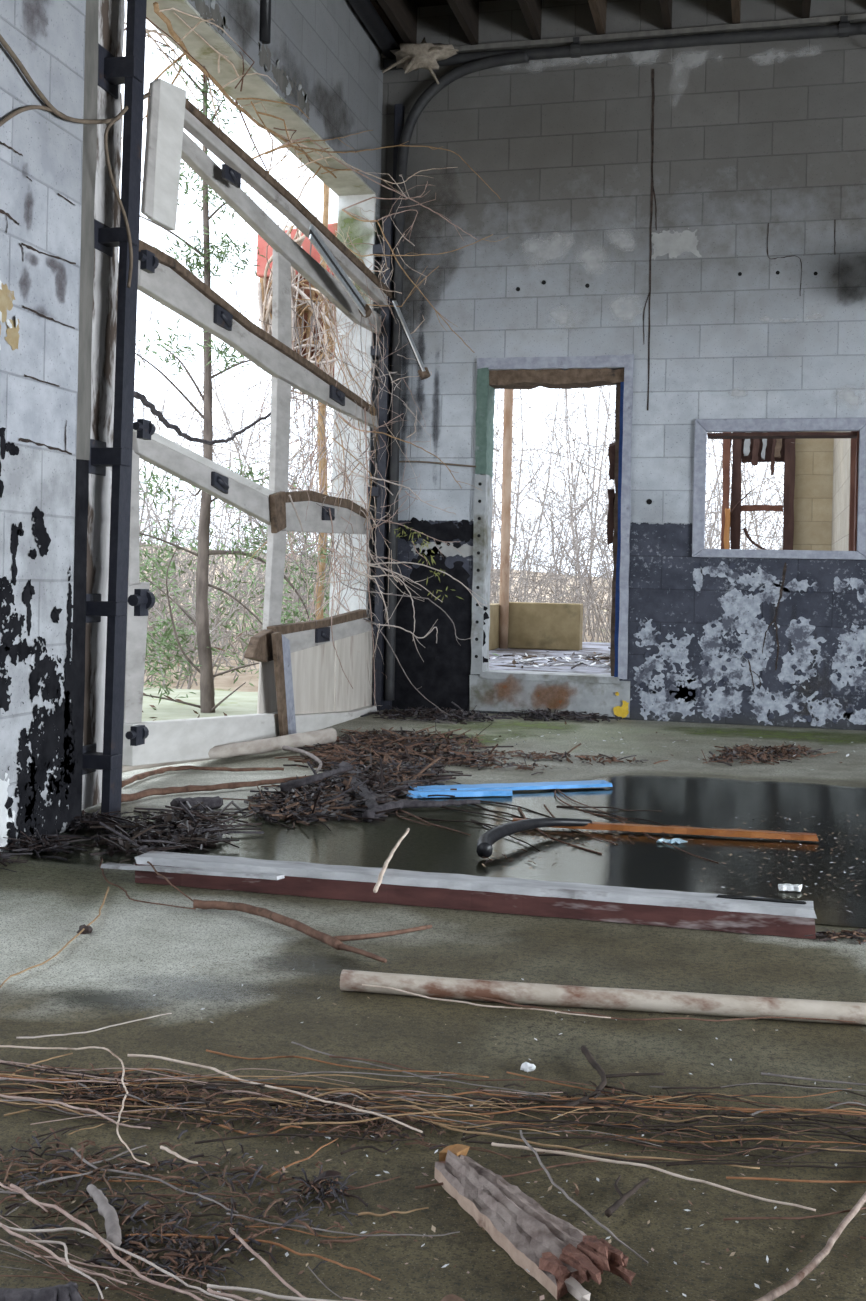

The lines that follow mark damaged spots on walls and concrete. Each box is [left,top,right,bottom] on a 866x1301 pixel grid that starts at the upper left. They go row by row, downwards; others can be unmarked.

peeling [0,506,79,853]
corrosion [534,686,572,708]
peeling [615,561,866,762]